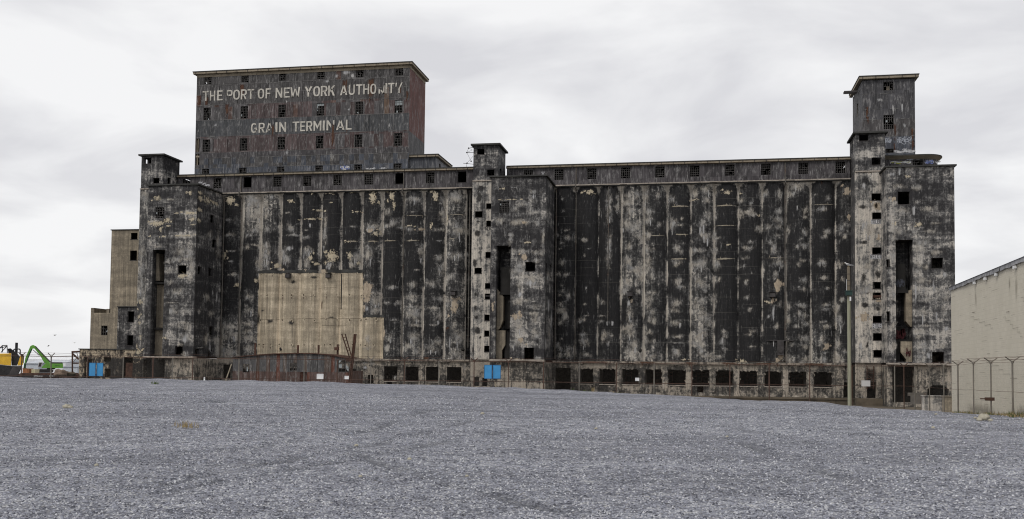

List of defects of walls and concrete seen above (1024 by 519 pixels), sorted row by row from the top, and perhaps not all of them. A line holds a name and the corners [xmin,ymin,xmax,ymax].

peeling [148,190,238,237]
damp [209,194,312,276]
peeling [352,191,396,213]
damp [737,183,843,290]
damp [366,192,466,359]
damp [599,186,725,359]
spalling [764,279,785,304]
damp [768,303,810,362]
damp [820,297,847,363]